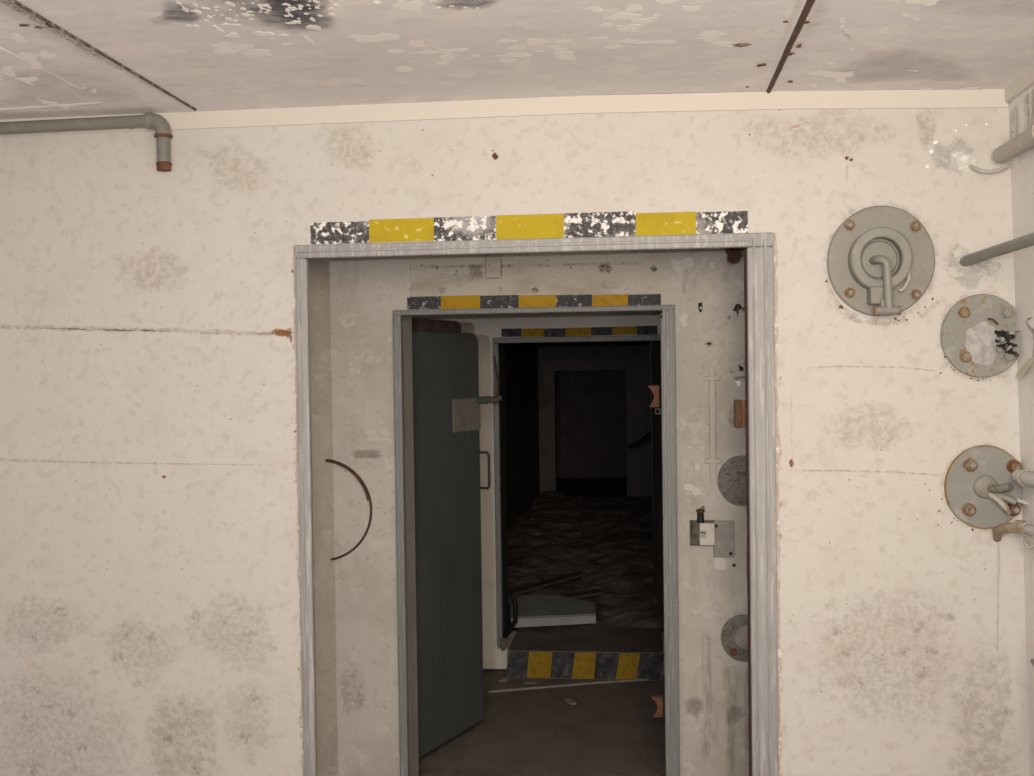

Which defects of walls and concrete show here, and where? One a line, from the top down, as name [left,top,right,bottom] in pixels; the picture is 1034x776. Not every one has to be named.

water stain [274,0,313,19]
peeling [0,23,58,85]
peeling [952,152,975,172]
flaking render [727,279,744,319]
peeling [679,303,703,328]
crack [48,325,157,333]
rust [272,328,292,342]